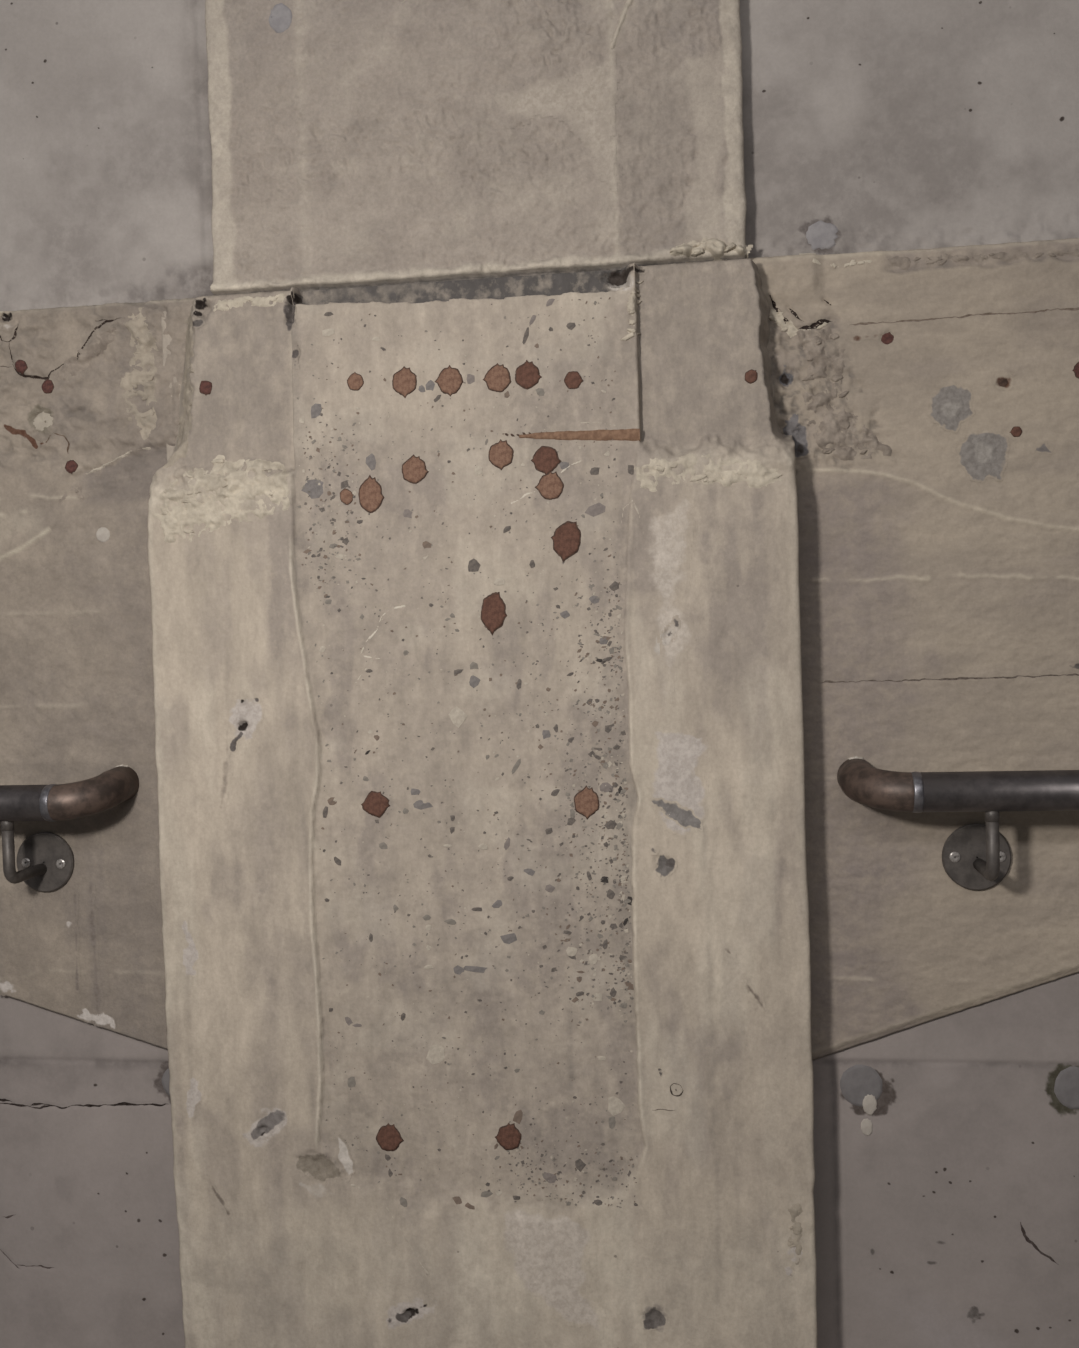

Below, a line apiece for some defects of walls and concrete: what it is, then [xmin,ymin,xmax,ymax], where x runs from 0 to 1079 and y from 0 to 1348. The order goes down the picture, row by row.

crack [0,318,118,380]
rust [483,360,542,392]
spalling [769,309,892,461]
rust [340,475,385,513]
rust [531,446,564,500]
rust [551,521,581,562]
spalling [153,264,786,1118]
water stain [65,879,117,1030]
crack [0,1099,167,1109]
spalling [238,1104,290,1153]
spalling [295,1106,405,1203]
spalling [453,1044,638,1209]